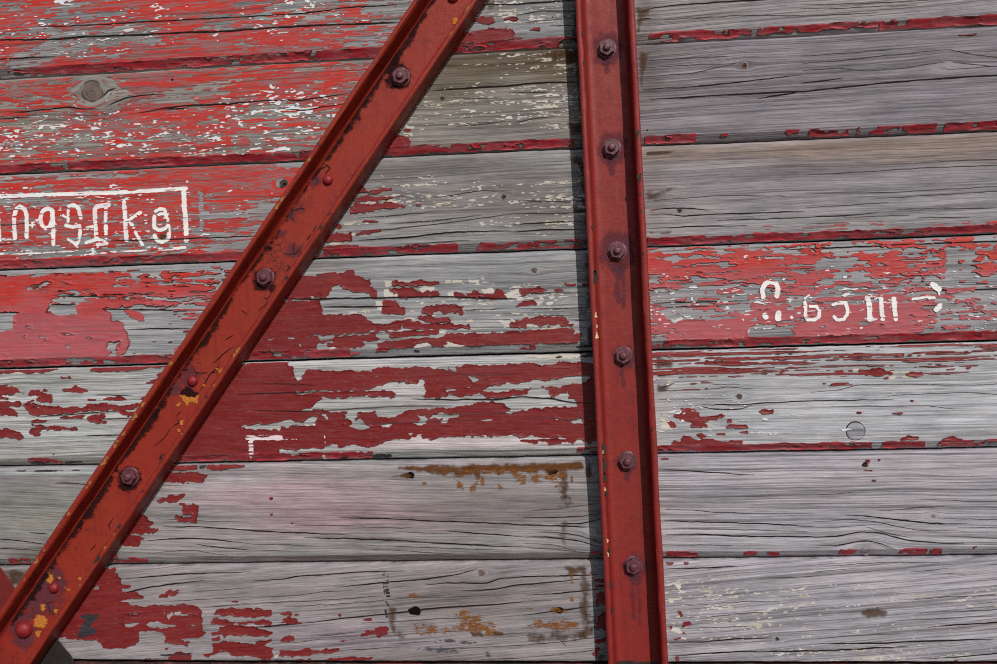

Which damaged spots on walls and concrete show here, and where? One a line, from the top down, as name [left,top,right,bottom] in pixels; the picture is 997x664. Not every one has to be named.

peeling [451,16,577,53]
peeling [383,129,575,156]
peeling [0,0,412,440]
peeling [314,186,459,257]
peeling [476,239,583,251]
rust [10,0,435,646]
peeling [647,220,997,390]
peeling [157,270,598,523]
rust [399,462,591,498]
peeling [59,514,373,661]
peeling [361,618,389,638]
peeling [590,572,607,656]